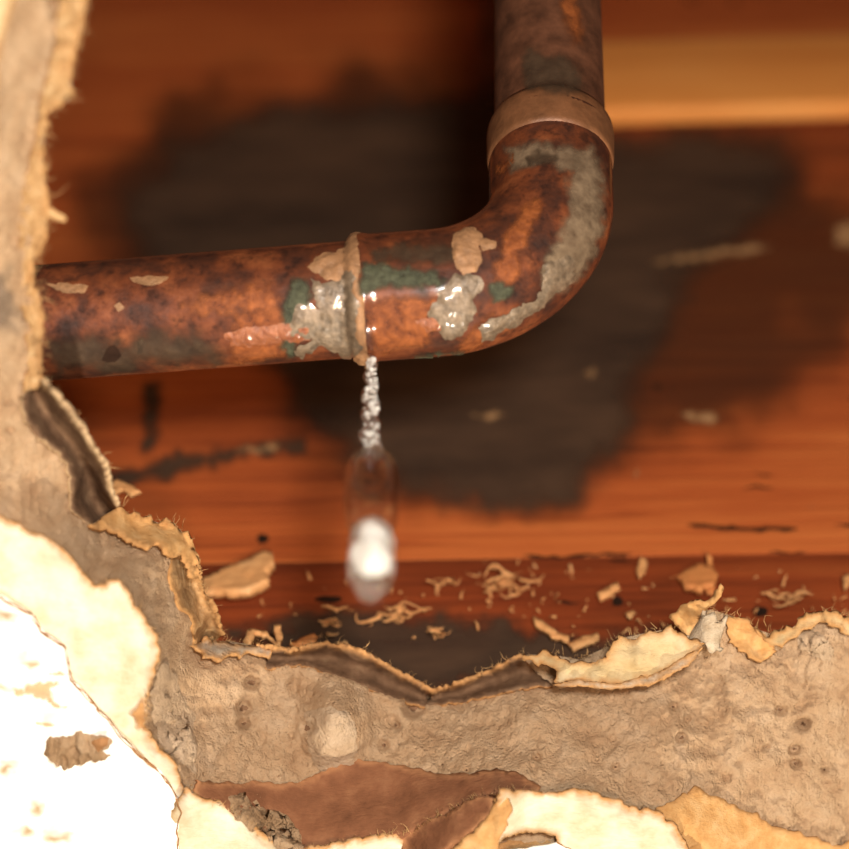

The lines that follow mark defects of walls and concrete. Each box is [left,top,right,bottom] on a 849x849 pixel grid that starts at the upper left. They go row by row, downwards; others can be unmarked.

damp [86,67,494,258]
damp [224,322,310,348]
damp [277,130,849,513]
damp [142,383,161,452]
damp [111,439,305,484]
peeling [669,583,728,653]
peeling [16,672,64,708]
spalling [43,731,113,771]
peeling [193,759,541,848]
peeling [498,840,551,849]
peeling [655,785,849,849]